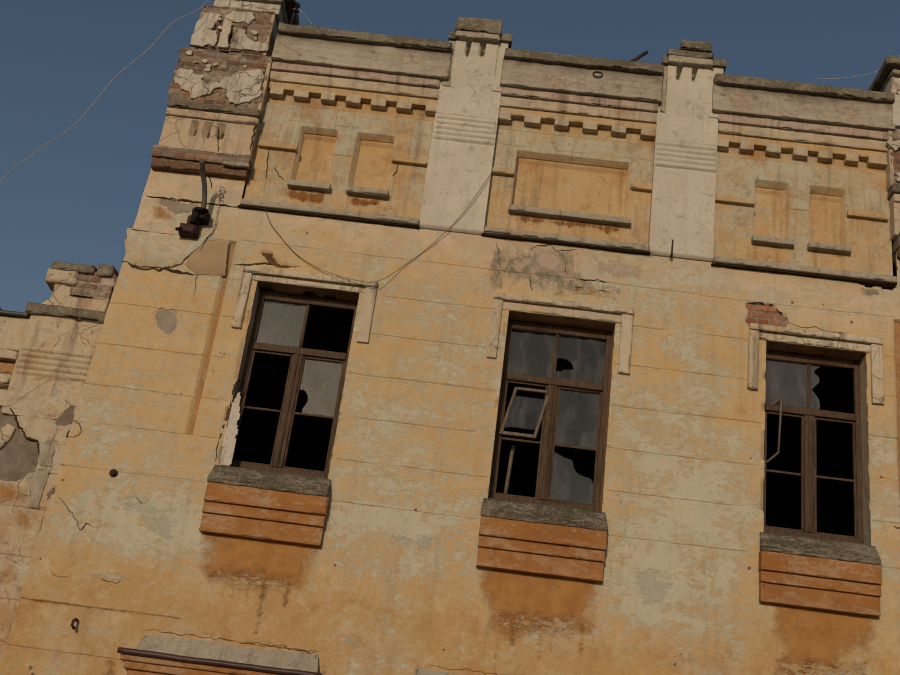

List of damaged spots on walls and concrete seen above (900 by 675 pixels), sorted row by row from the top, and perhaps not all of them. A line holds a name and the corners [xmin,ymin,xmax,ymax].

flaking render [167,5,274,110]
flaking render [886,89,900,184]
flaking render [262,253,296,268]
flaking render [746,302,788,327]
flaking render [0,406,56,509]
flaking render [55,405,75,426]
flaking render [219,392,241,466]